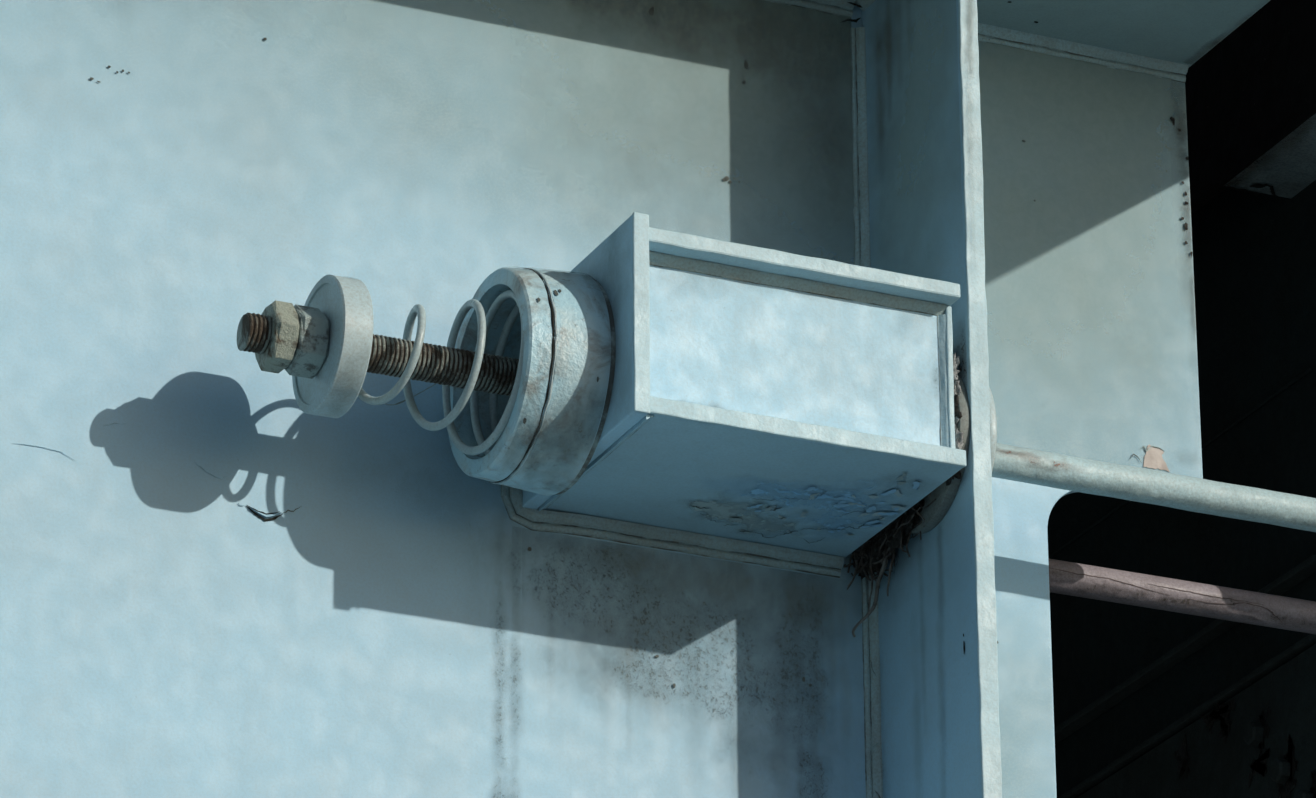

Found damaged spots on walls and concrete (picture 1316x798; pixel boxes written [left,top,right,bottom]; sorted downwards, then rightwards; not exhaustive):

peeling [1130,444,1170,472]
crack [195,462,301,521]
damp [530,550,828,716]